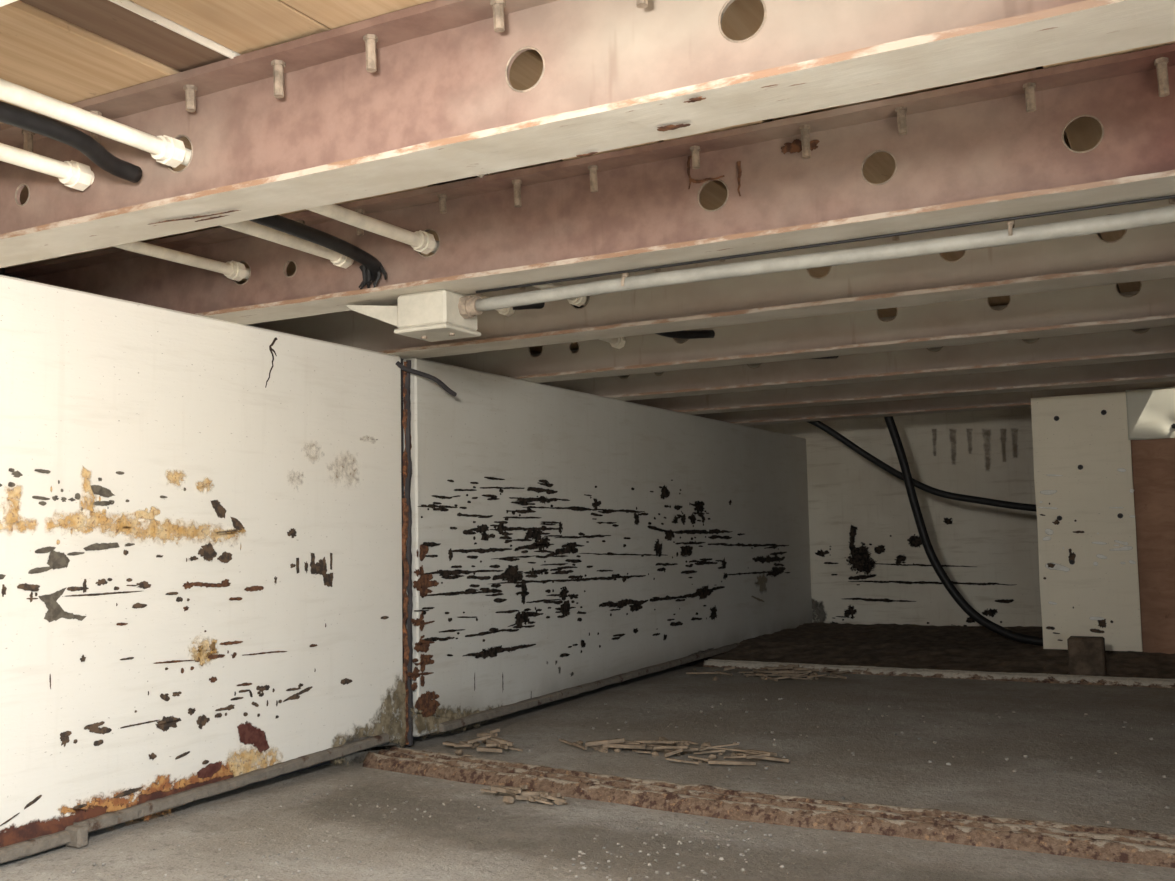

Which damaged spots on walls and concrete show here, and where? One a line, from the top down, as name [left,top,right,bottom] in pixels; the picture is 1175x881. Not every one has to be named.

peeling [0,468,129,511]
peeling [0,542,151,622]
peeling [186,500,244,563]
rust [402,362,412,744]
peeling [413,544,439,597]
peeling [815,525,922,585]
peeling [154,630,287,674]
peeling [407,611,440,717]
peeling [89,727,112,746]
peeling [156,683,252,730]
peeling [237,721,269,753]
rust [0,749,278,848]